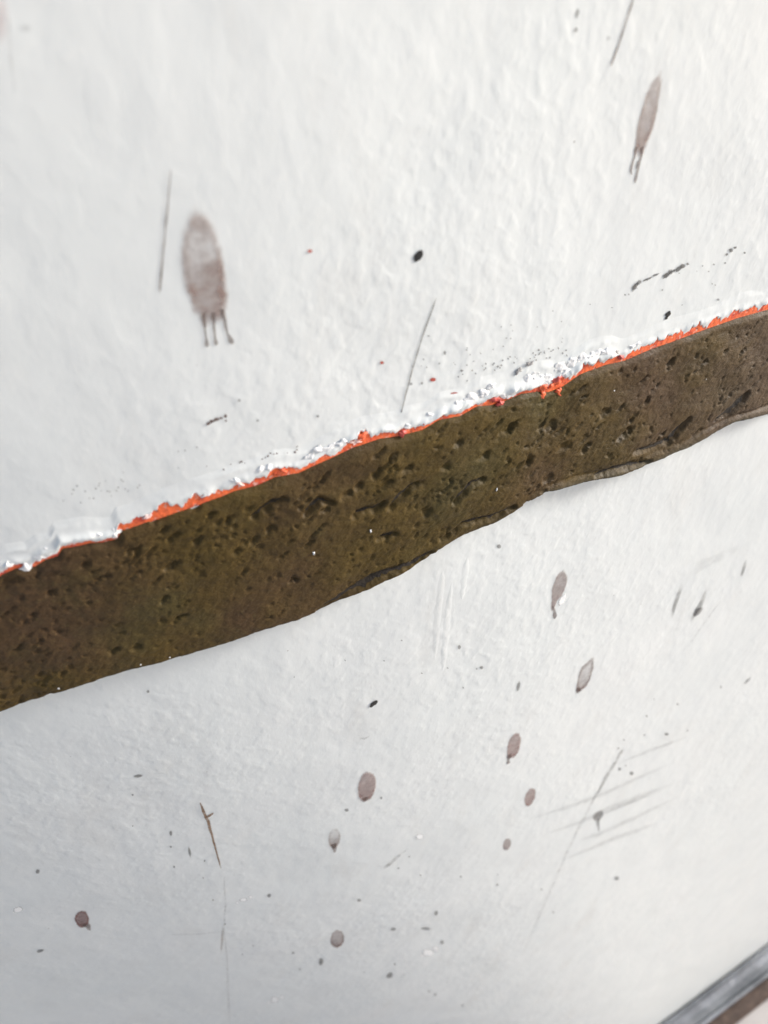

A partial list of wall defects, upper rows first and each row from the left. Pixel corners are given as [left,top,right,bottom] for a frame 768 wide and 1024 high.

peeling [0,289,768,576]